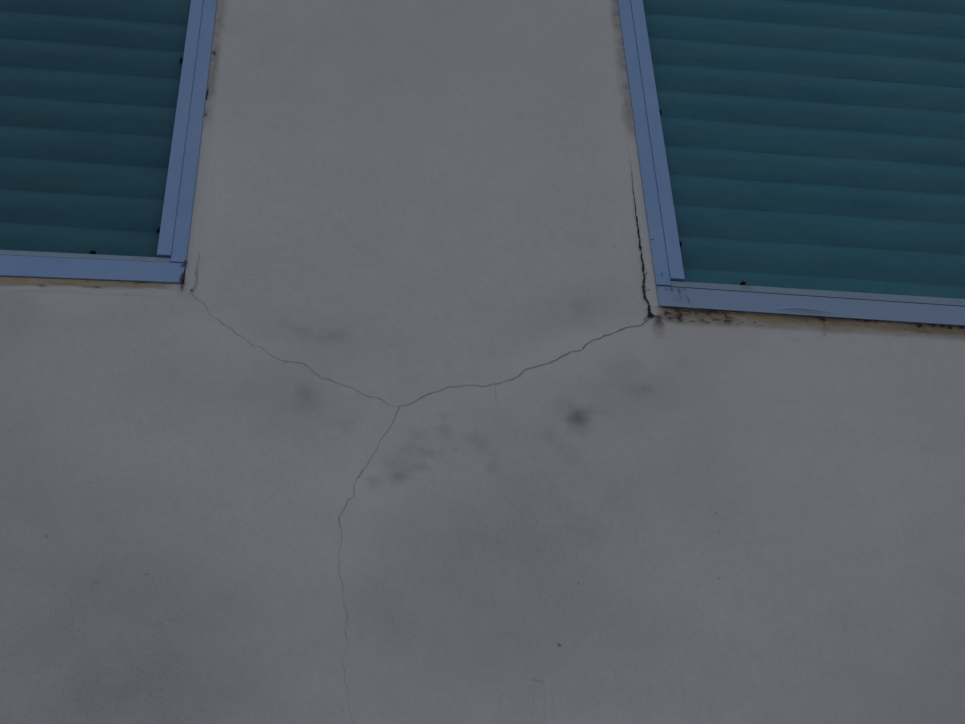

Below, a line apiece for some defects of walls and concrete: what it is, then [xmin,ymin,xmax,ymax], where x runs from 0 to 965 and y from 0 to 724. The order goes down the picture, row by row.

crack [617,160,658,332]